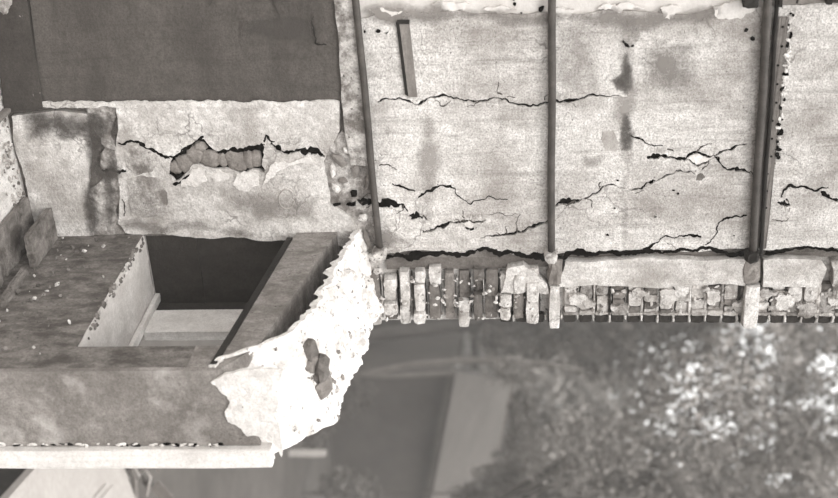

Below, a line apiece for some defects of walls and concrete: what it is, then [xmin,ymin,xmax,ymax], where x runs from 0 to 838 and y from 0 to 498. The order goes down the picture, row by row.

peeling [0,0,12,15]
leakage [369,5,446,25]
leakage [583,9,715,44]
leakage [652,51,688,84]
crack [378,82,605,108]
leakage [613,56,633,149]
crack [118,134,325,159]
flaking render [170,139,317,192]
crack [352,135,753,262]
crack [772,183,838,222]
flaking render [302,338,333,400]
flaking render [211,366,283,457]